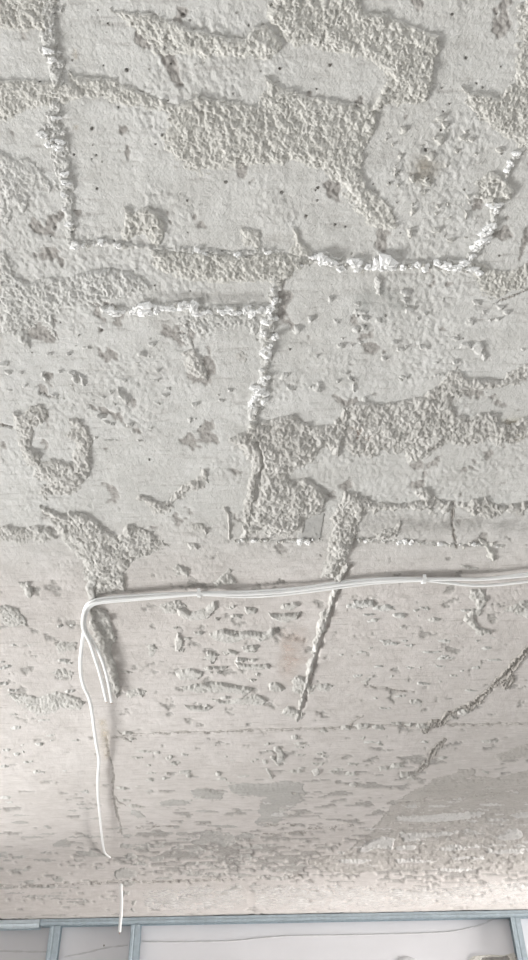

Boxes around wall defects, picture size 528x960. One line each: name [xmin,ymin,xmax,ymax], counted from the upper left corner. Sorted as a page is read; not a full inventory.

spalling [0,641,86,730]
peeling [159,600,300,712]
crack [106,643,528,835]
spalling [346,588,502,692]
peeling [0,731,528,912]